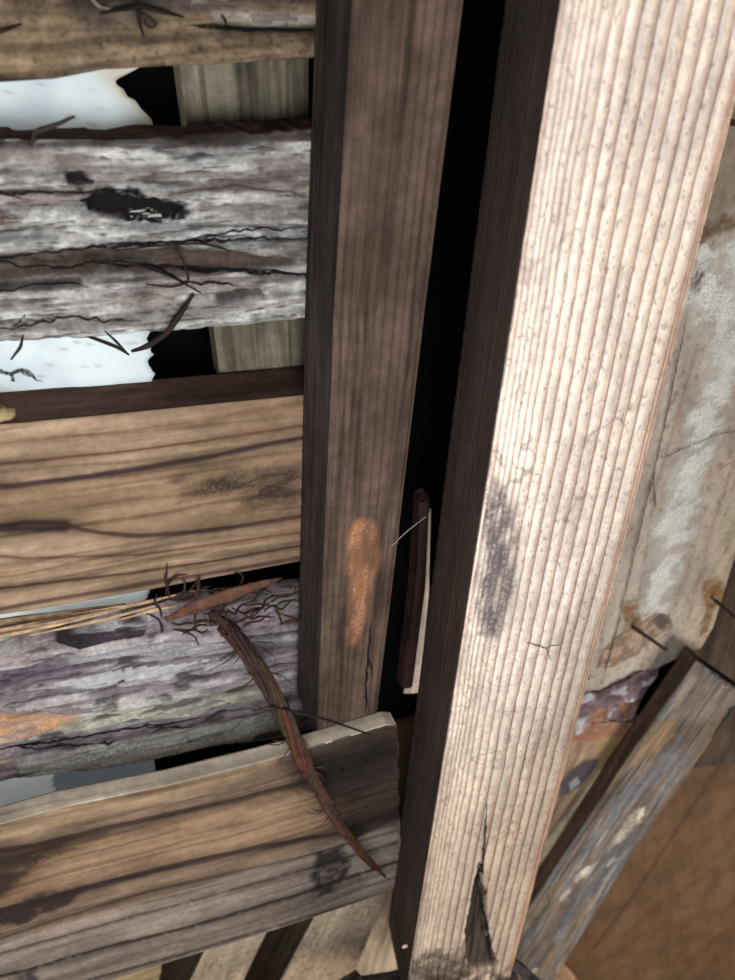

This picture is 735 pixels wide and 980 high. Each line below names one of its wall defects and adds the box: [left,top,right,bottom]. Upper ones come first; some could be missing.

crack [186,13,314,33]
crack [0,226,307,292]
crack [0,314,140,330]
crack [0,368,43,382]
damp [476,492,517,635]
crack [465,803,493,970]